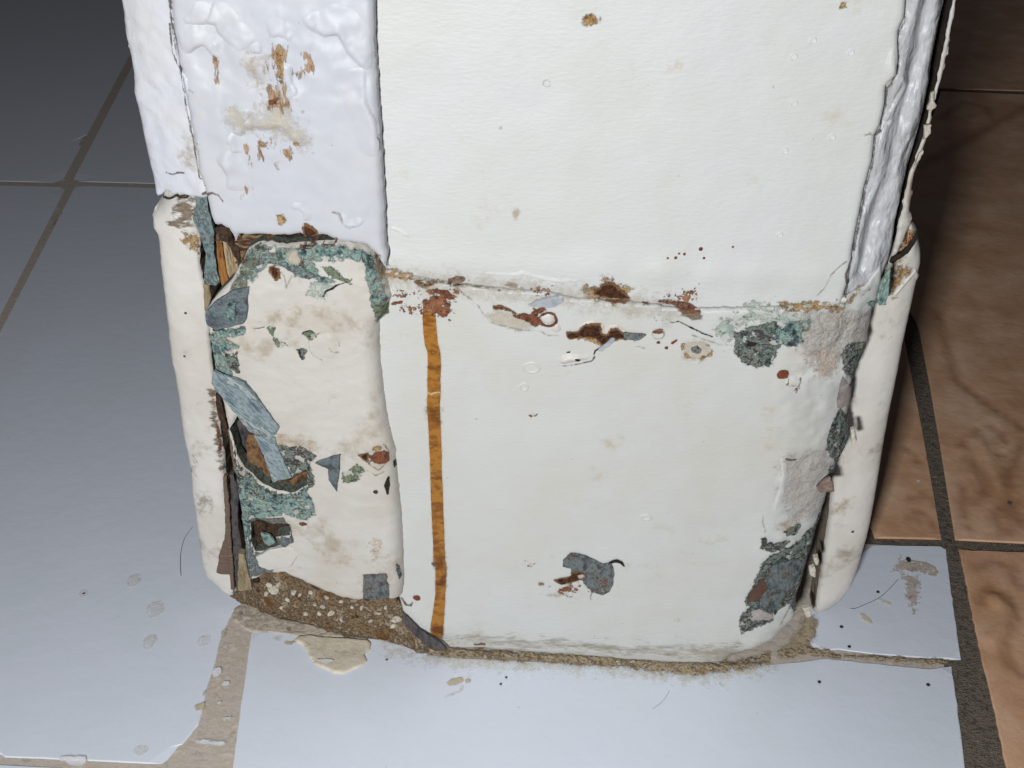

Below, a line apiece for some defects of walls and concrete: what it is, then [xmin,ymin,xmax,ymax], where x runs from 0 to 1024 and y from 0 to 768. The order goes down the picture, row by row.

rust [264,44,315,113]
rust [244,140,272,164]
peeling [913,124,931,169]
peeling [205,286,316,360]
crack [418,279,499,293]
rust [506,283,553,296]
rust [643,288,702,320]
peeling [212,352,292,482]
rust [181,196,469,638]
peeling [315,454,341,491]
spalling [358,446,389,476]
spalling [554,553,625,597]